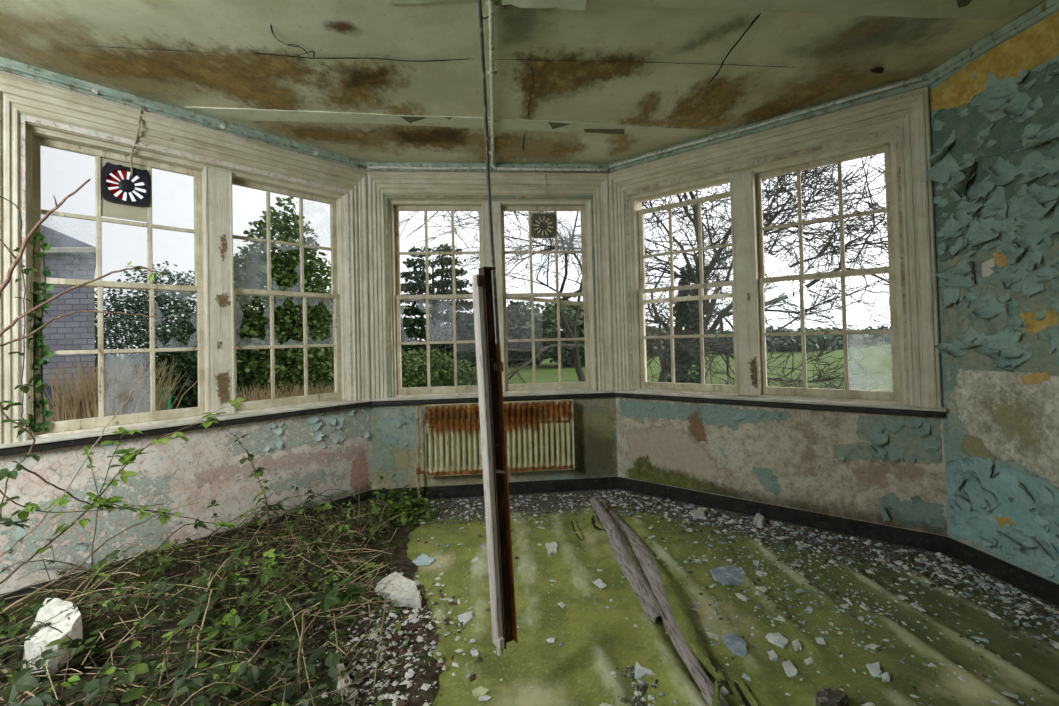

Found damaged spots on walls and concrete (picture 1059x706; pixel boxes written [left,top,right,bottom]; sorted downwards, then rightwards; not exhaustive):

water stain [0,13,578,161]
crack [497,59,578,151]
water stain [522,52,644,120]
crack [606,13,798,84]
water stain [610,22,920,155]
peeling [834,11,1059,579]
rust [424,404,480,435]
rust [504,400,574,434]